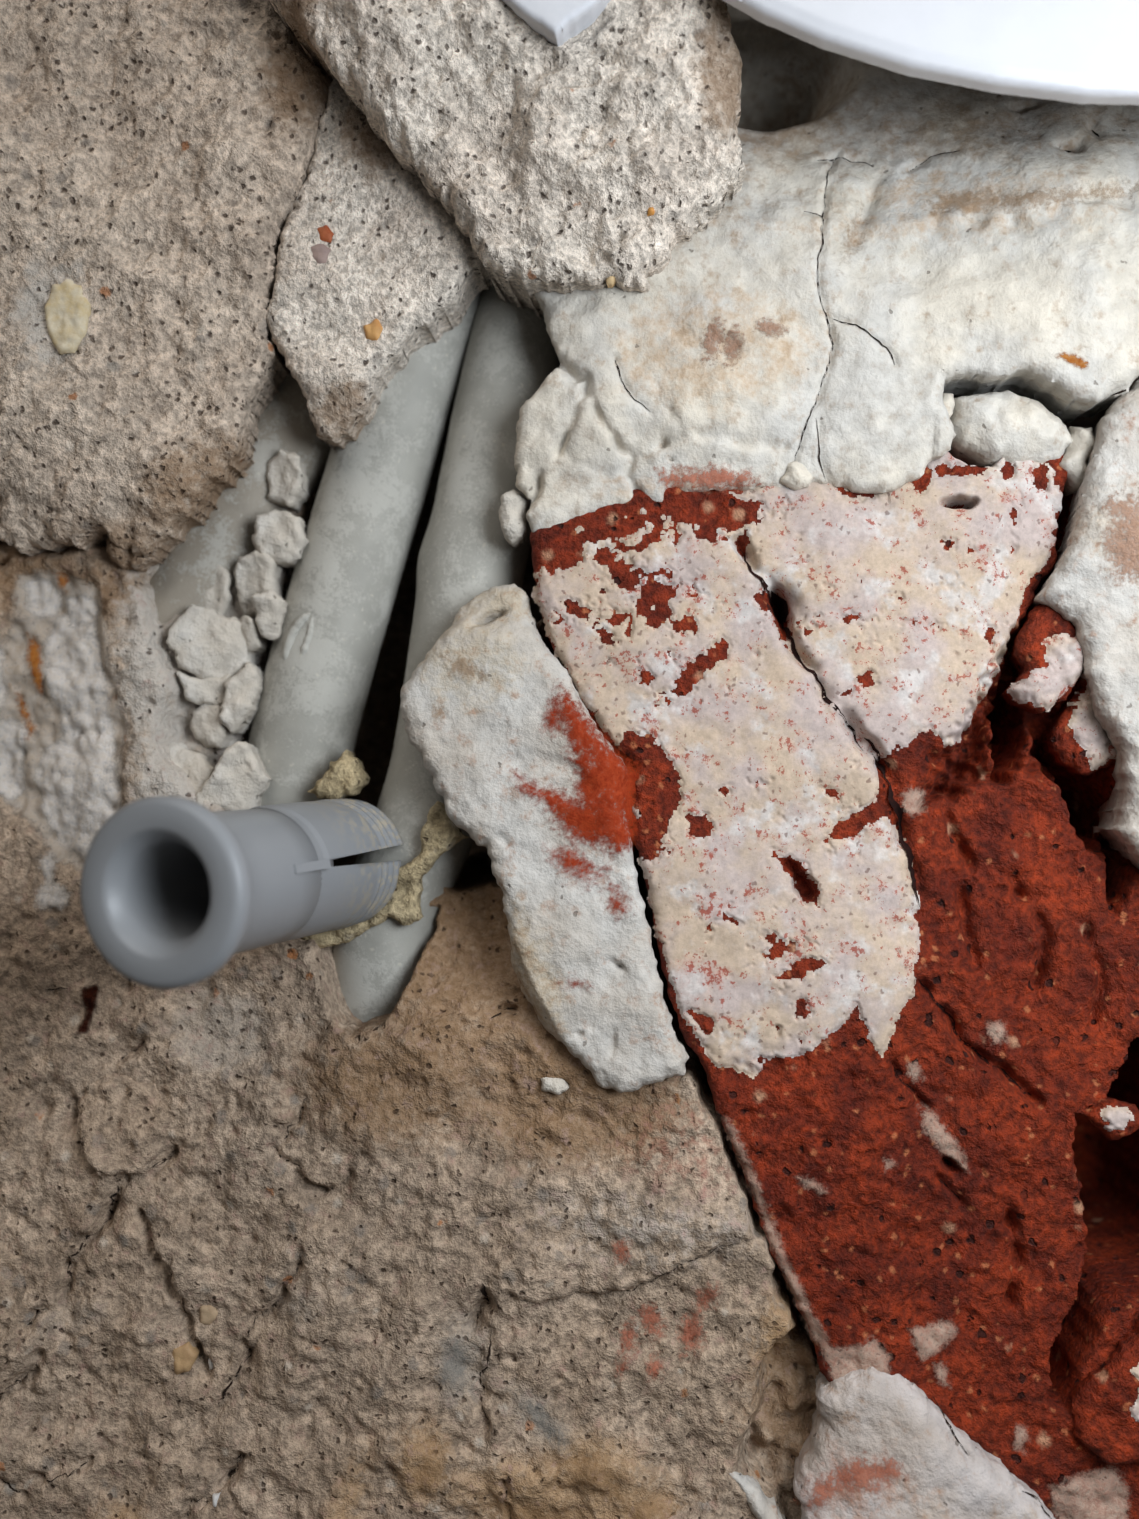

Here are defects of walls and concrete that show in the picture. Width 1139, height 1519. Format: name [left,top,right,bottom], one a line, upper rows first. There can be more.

crack [615,360,647,409]
crack [795,150,960,481]
spalling [1100,492,1139,586]
peeling [531,452,1063,1080]
crack [738,546,920,907]
crack [67,1148,178,1279]
peeling [722,1118,827,1341]
peeling [921,1110,967,1169]
crack [216,1255,302,1414]
crack [477,1283,492,1443]
peeling [909,1320,956,1389]
peeling [1048,1465,1129,1519]